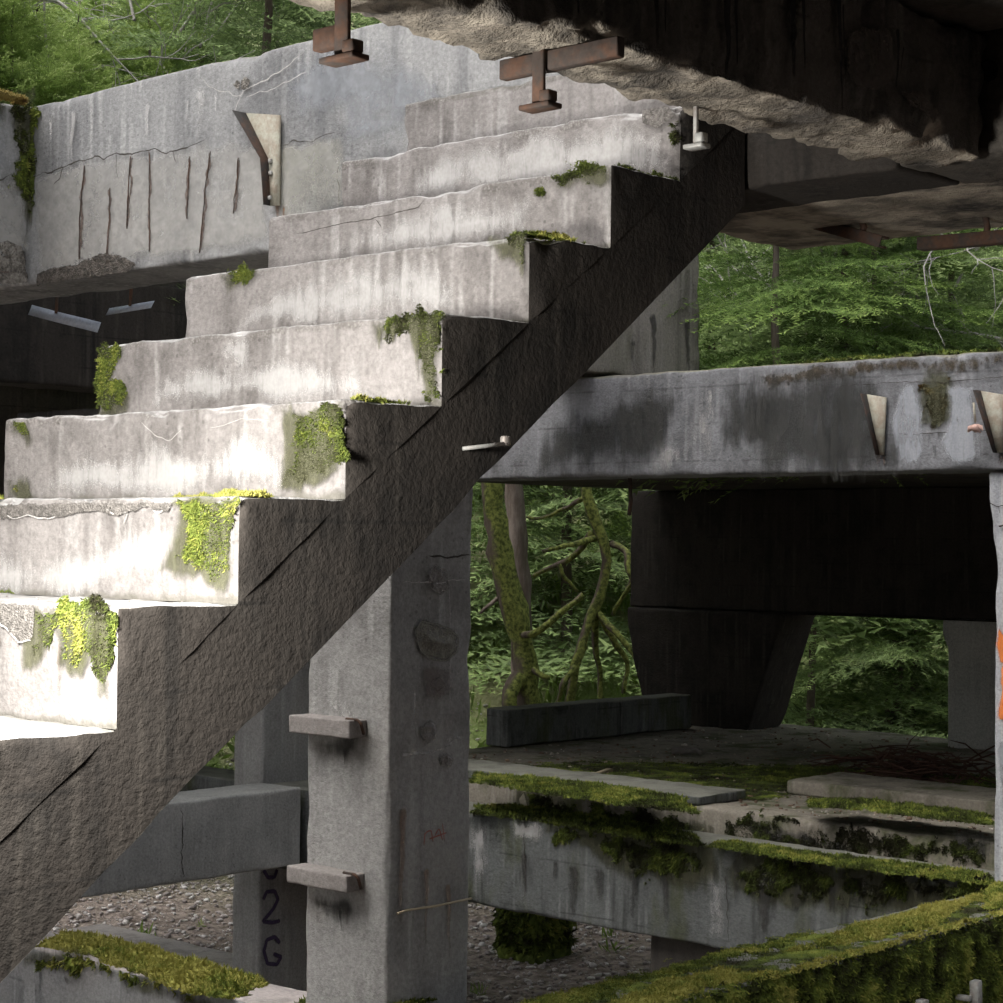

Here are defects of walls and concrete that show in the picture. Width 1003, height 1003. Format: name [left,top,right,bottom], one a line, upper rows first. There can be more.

crack [37,140,204,184]
peeling [0,146,265,286]
leakage [541,390,673,471]
leakage [723,354,1002,473]
spalling [0,604,35,643]